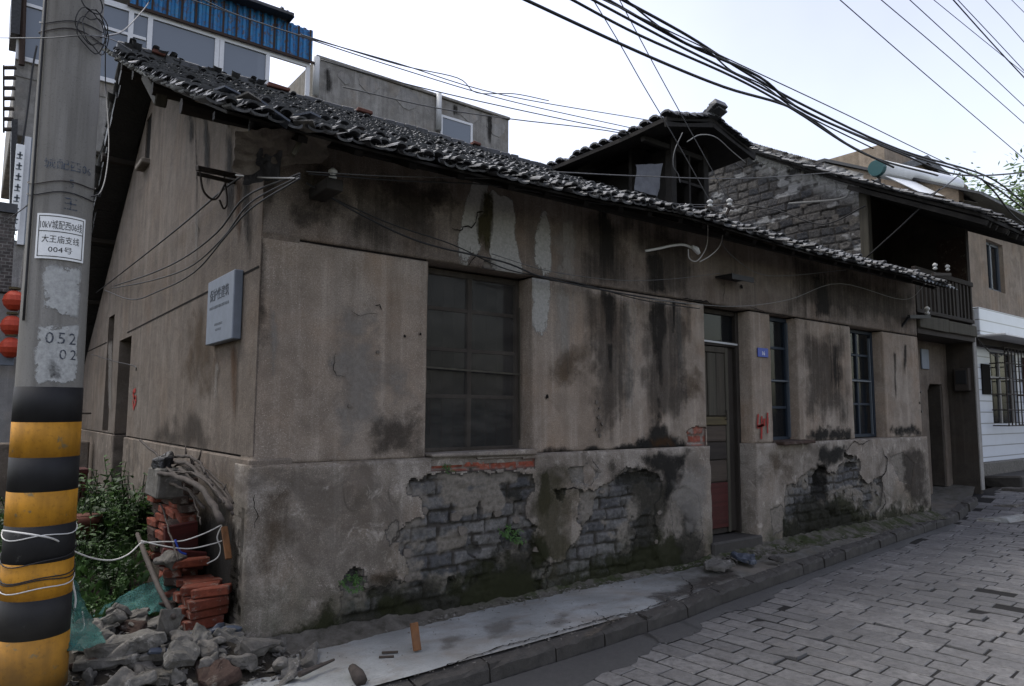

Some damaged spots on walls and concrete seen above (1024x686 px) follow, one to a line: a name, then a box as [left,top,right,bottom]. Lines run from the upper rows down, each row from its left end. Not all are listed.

peeling [457,182,551,335]
damp [375,419,418,452]
flaking render [334,463,704,624]
damp [584,226,705,533]
flaking render [770,452,883,537]